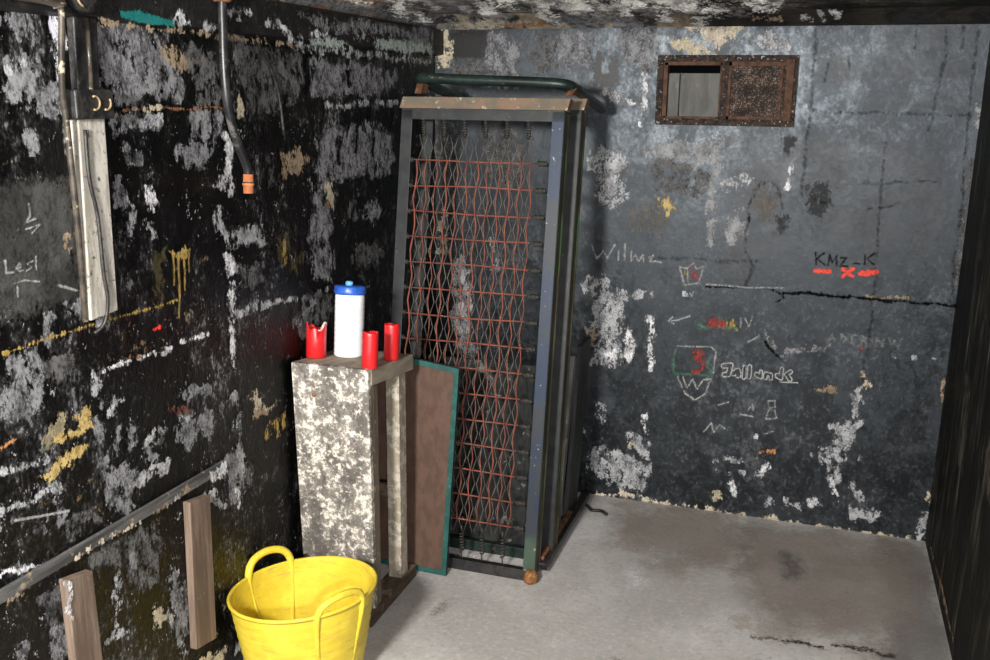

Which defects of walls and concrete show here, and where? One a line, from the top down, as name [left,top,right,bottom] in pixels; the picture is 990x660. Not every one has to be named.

crack [705,284,956,308]
crack [748,332,832,362]
crack [731,616,896,658]